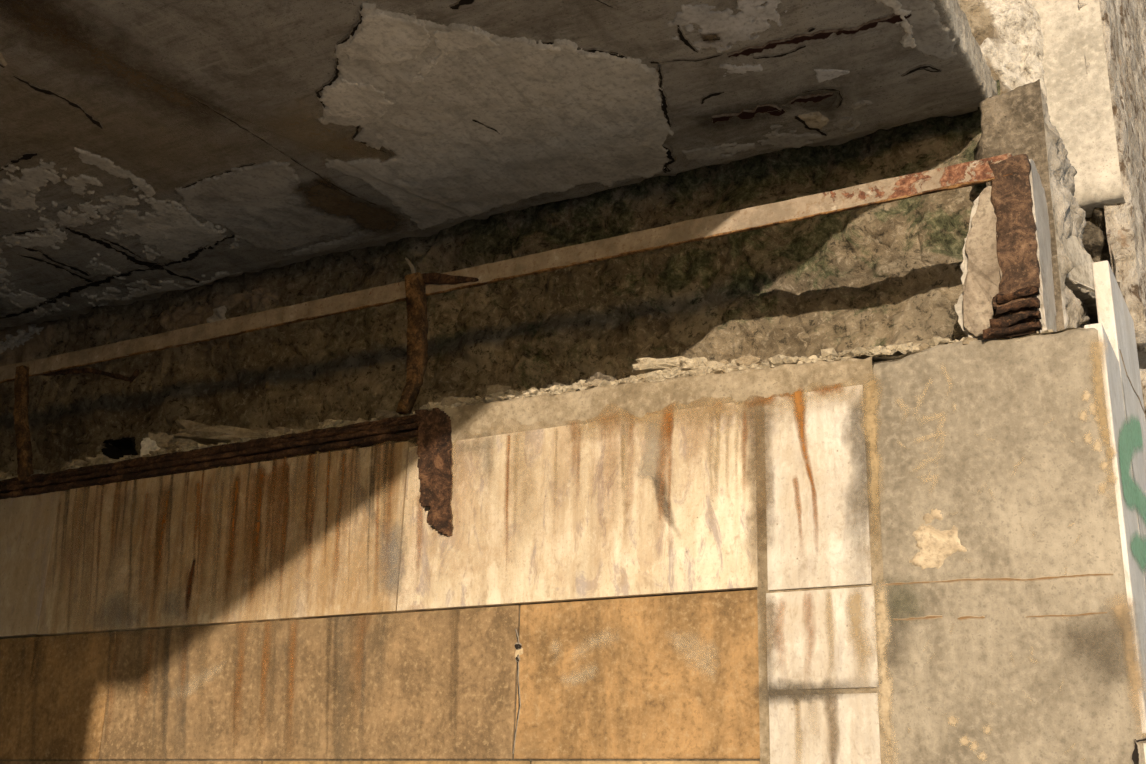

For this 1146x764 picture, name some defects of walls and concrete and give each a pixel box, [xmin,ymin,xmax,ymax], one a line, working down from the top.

peeling [341,12,499,84]
crack [449,0,475,10]
peeling [665,0,916,77]
crack [0,64,104,129]
peeling [318,78,394,120]
peeling [0,147,278,367]
corrosion [422,173,1013,296]
crack [1119,349,1145,414]
corrosion [749,390,816,522]
corrosion [306,433,396,562]
spalling [909,508,967,570]
corrosion [827,696,838,764]